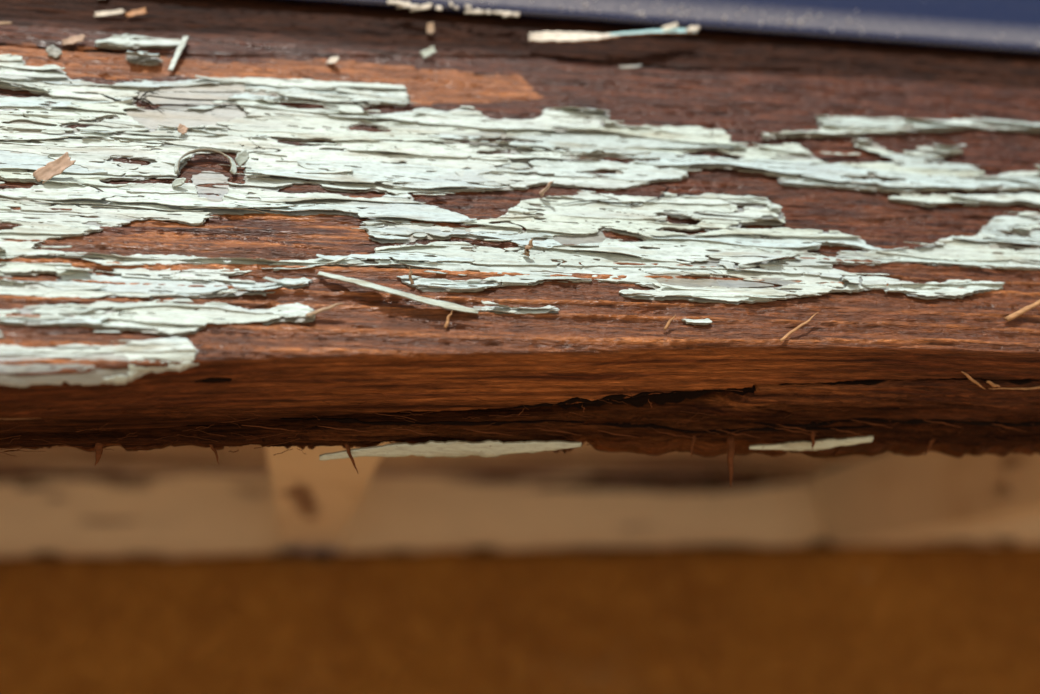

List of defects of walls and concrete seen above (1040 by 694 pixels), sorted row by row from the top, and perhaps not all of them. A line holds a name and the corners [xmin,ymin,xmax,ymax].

peeling [93,9,125,17]
peeling [529,22,700,43]
peeling [0,34,1040,387]
crack [242,418,1040,439]
peeling [749,435,874,451]